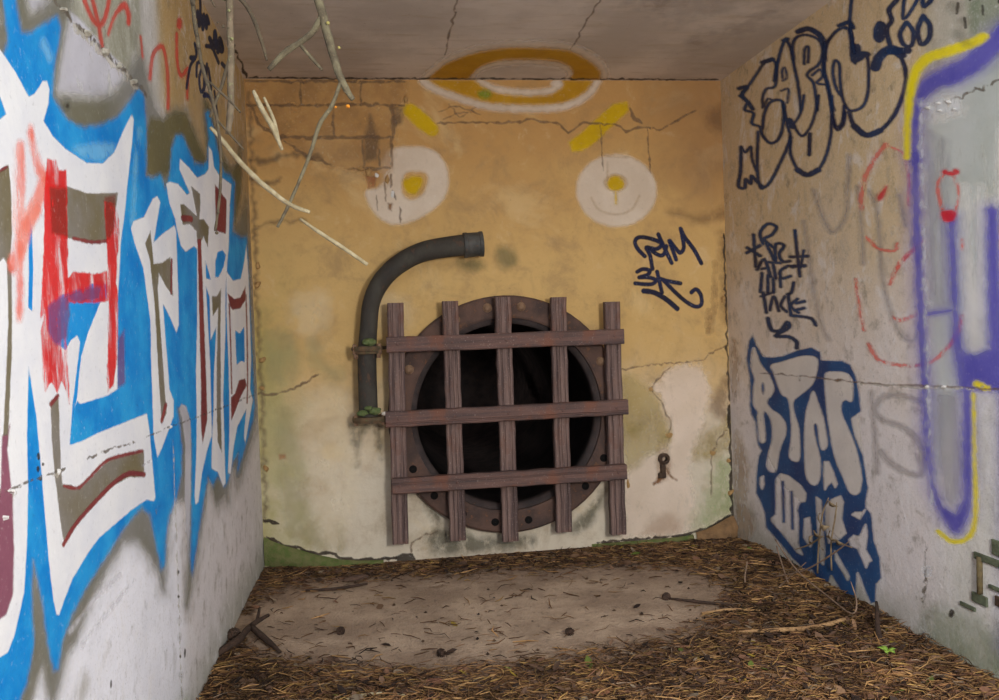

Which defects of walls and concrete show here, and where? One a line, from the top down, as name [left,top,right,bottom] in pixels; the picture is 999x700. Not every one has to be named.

crack [951,79,999,100]
crack [2,0,734,561]
peeling [622,364,711,539]